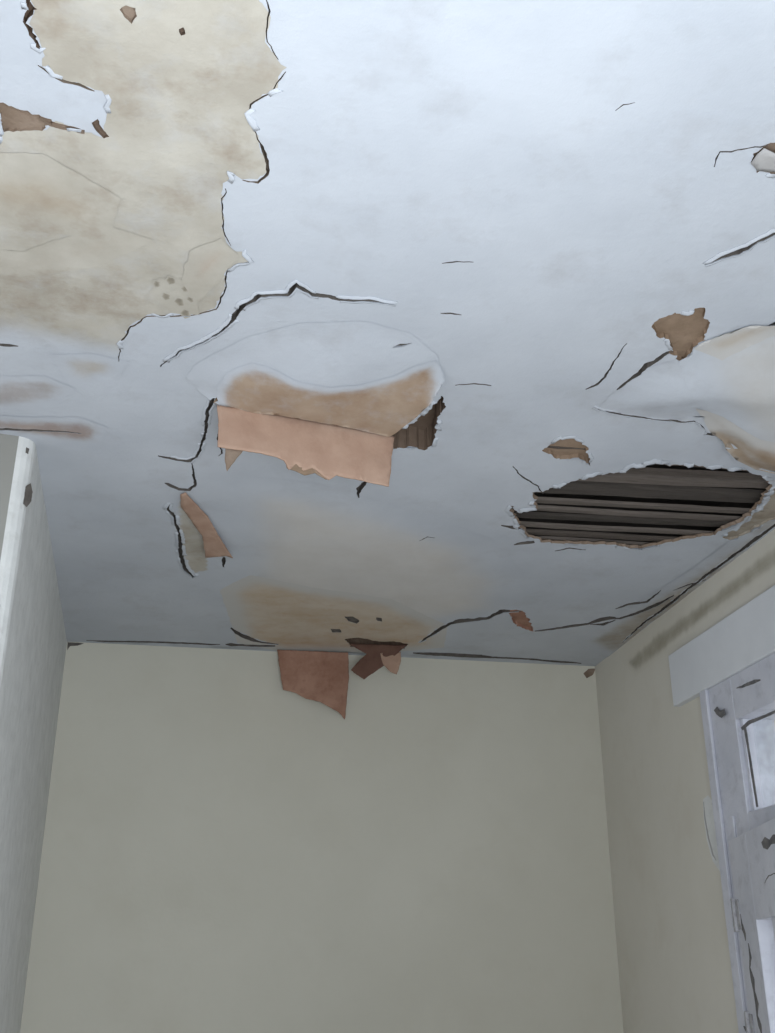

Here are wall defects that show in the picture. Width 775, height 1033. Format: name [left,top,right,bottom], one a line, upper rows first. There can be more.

water stain [0,153,153,279]
peeling [0,0,287,362]
flaking render [751,143,775,178]
water stain [149,238,238,319]
crack [160,279,398,367]
flaking render [617,308,710,390]
crack [158,398,223,491]
peeling [420,401,442,447]
peeling [163,492,233,579]
flaking render [501,436,775,550]